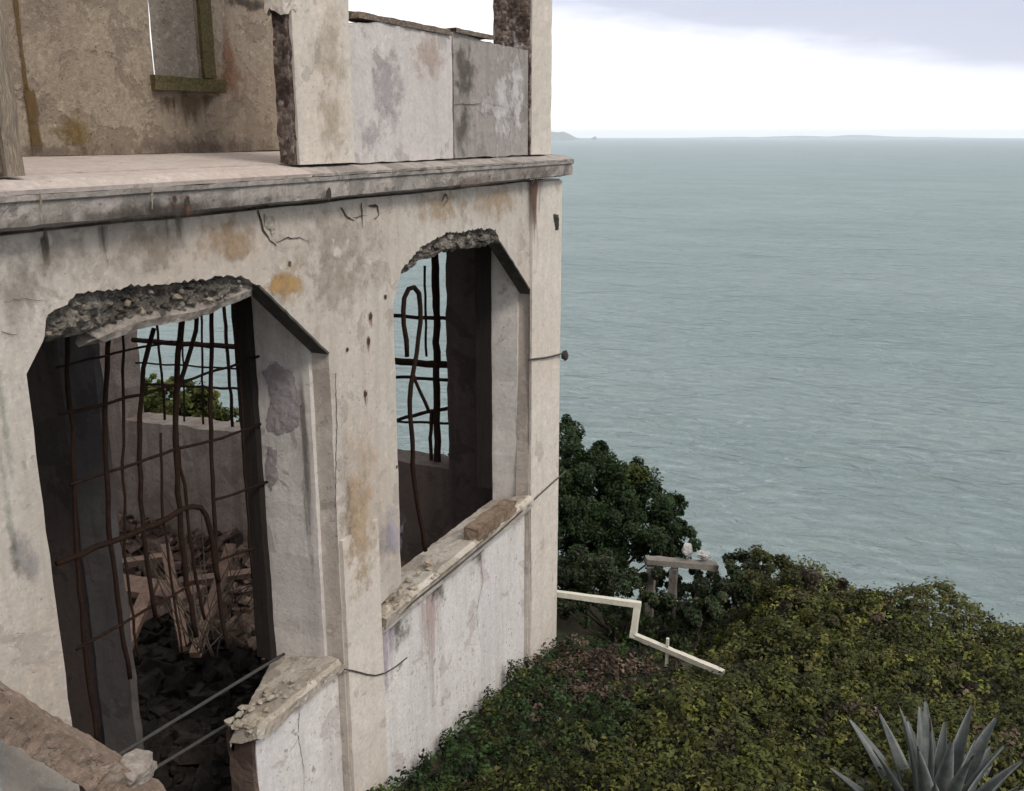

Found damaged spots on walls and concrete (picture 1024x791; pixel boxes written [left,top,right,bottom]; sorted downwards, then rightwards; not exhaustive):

crack [242,205,309,246]
crack [341,202,379,227]
spalling [393,229,496,462]
spalling [45,276,302,741]
spalling [381,559,442,616]